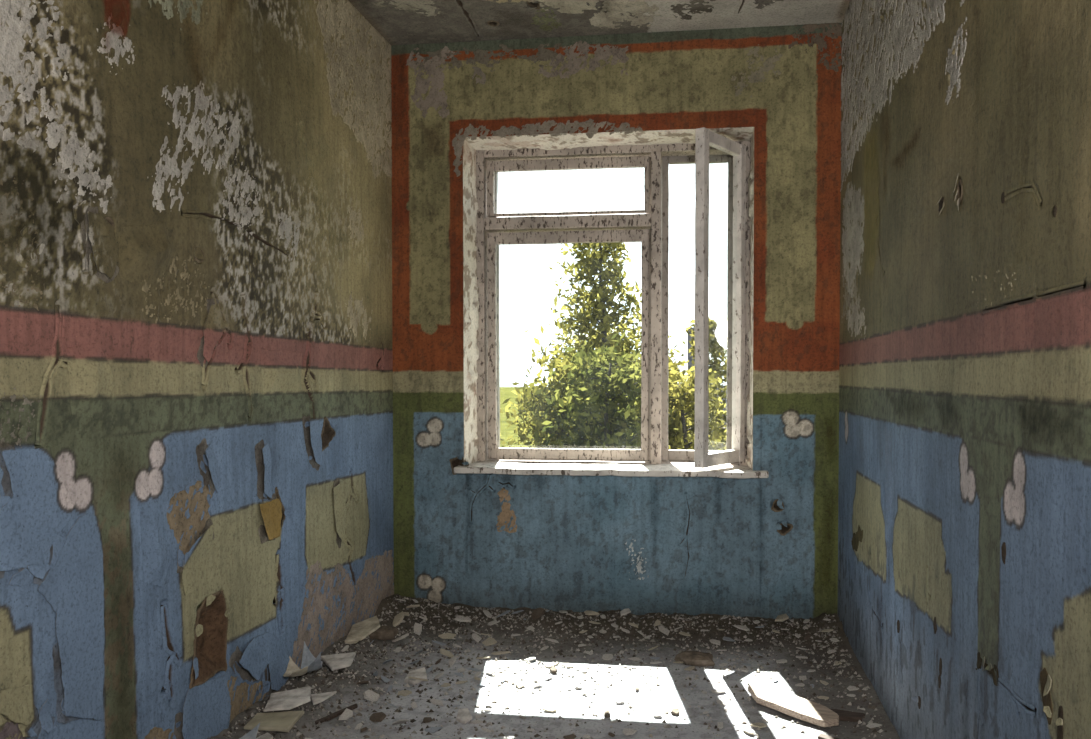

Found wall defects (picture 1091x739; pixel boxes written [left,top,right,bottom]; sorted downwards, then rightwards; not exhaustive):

peeling [96,16,135,75]
peeling [481,0,716,29]
peeling [0,0,119,283]
peeling [147,81,265,239]
peeling [788,0,946,339]
crack [35,305,72,446]
crack [201,290,253,417]
crack [301,294,326,420]
peeling [0,387,106,739]
peeling [145,438,394,739]
crack [273,554,286,629]
crack [344,471,358,595]